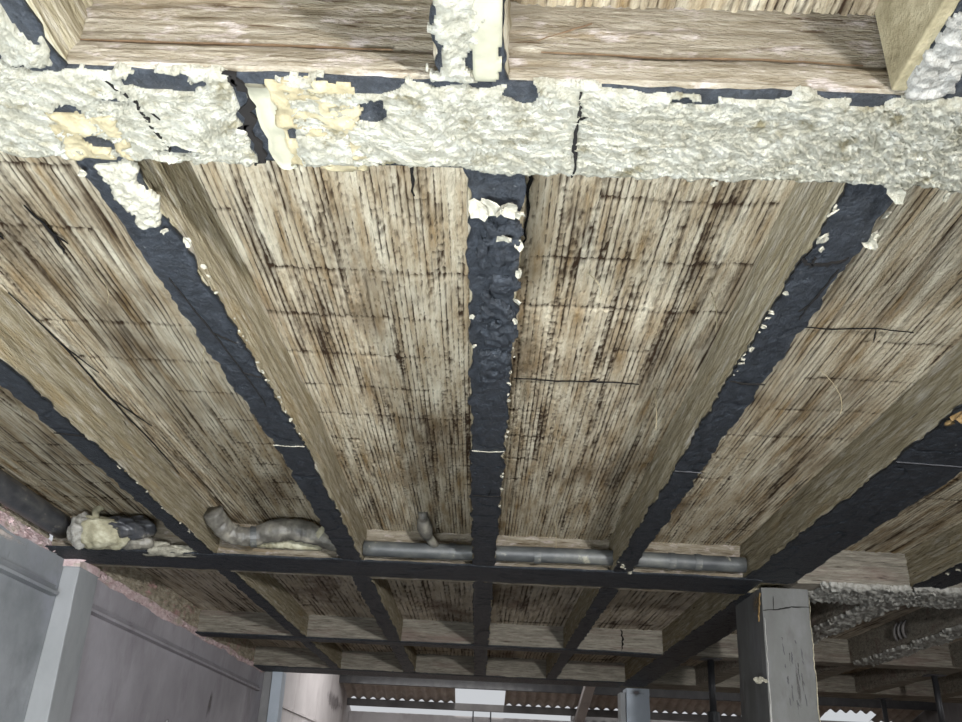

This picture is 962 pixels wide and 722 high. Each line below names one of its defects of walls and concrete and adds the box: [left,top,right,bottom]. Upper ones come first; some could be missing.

spalling [944,411,962,426]